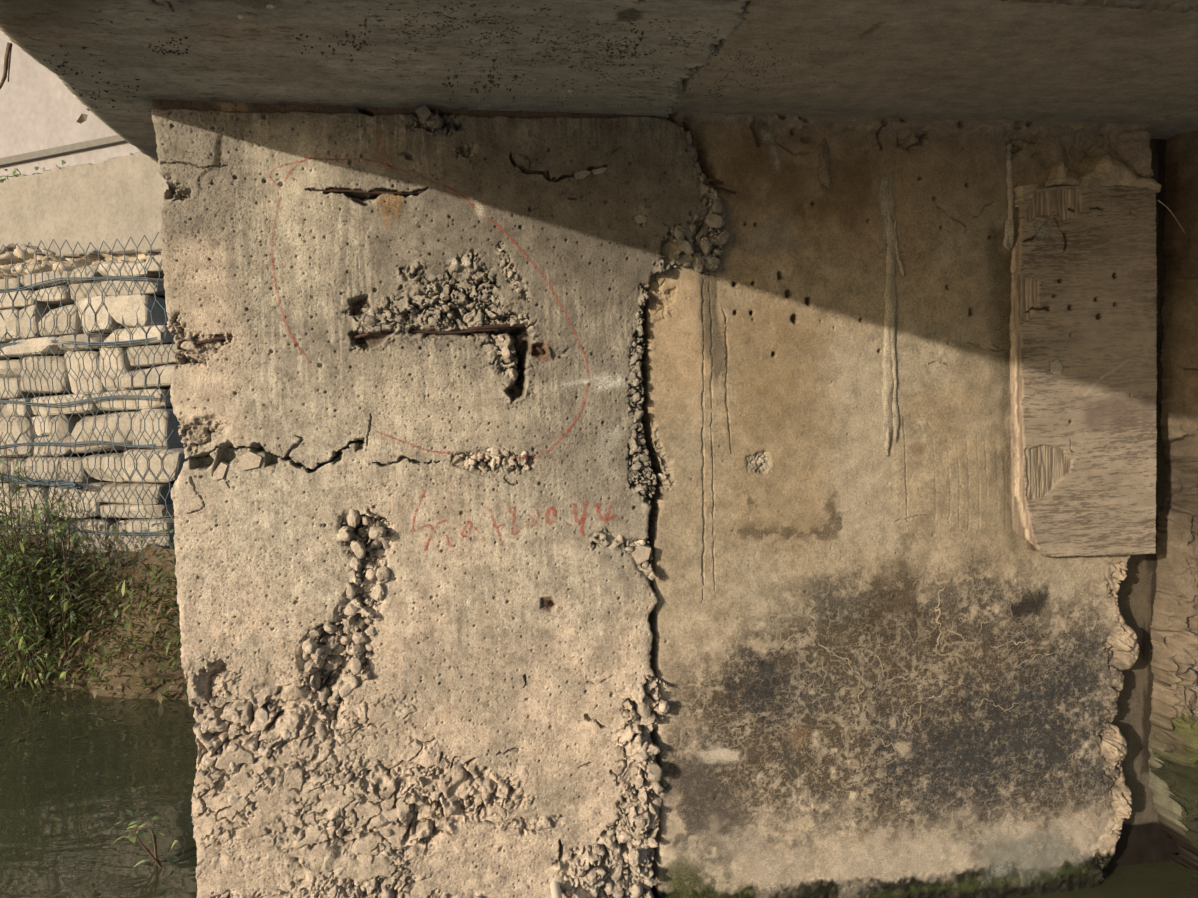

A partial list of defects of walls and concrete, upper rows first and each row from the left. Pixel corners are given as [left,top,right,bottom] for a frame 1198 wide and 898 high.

crack [1000,0,1198,13]
crack [510,146,623,182]
crack [305,187,429,206]
spalling [345,241,545,407]
spalling [627,128,736,503]
crack [187,414,446,513]
spalling [590,528,656,581]
spalling [1150,557,1198,729]
spalling [198,658,232,704]
damp [662,567,1113,891]
spalling [499,814,564,857]
spalling [217,876,483,898]